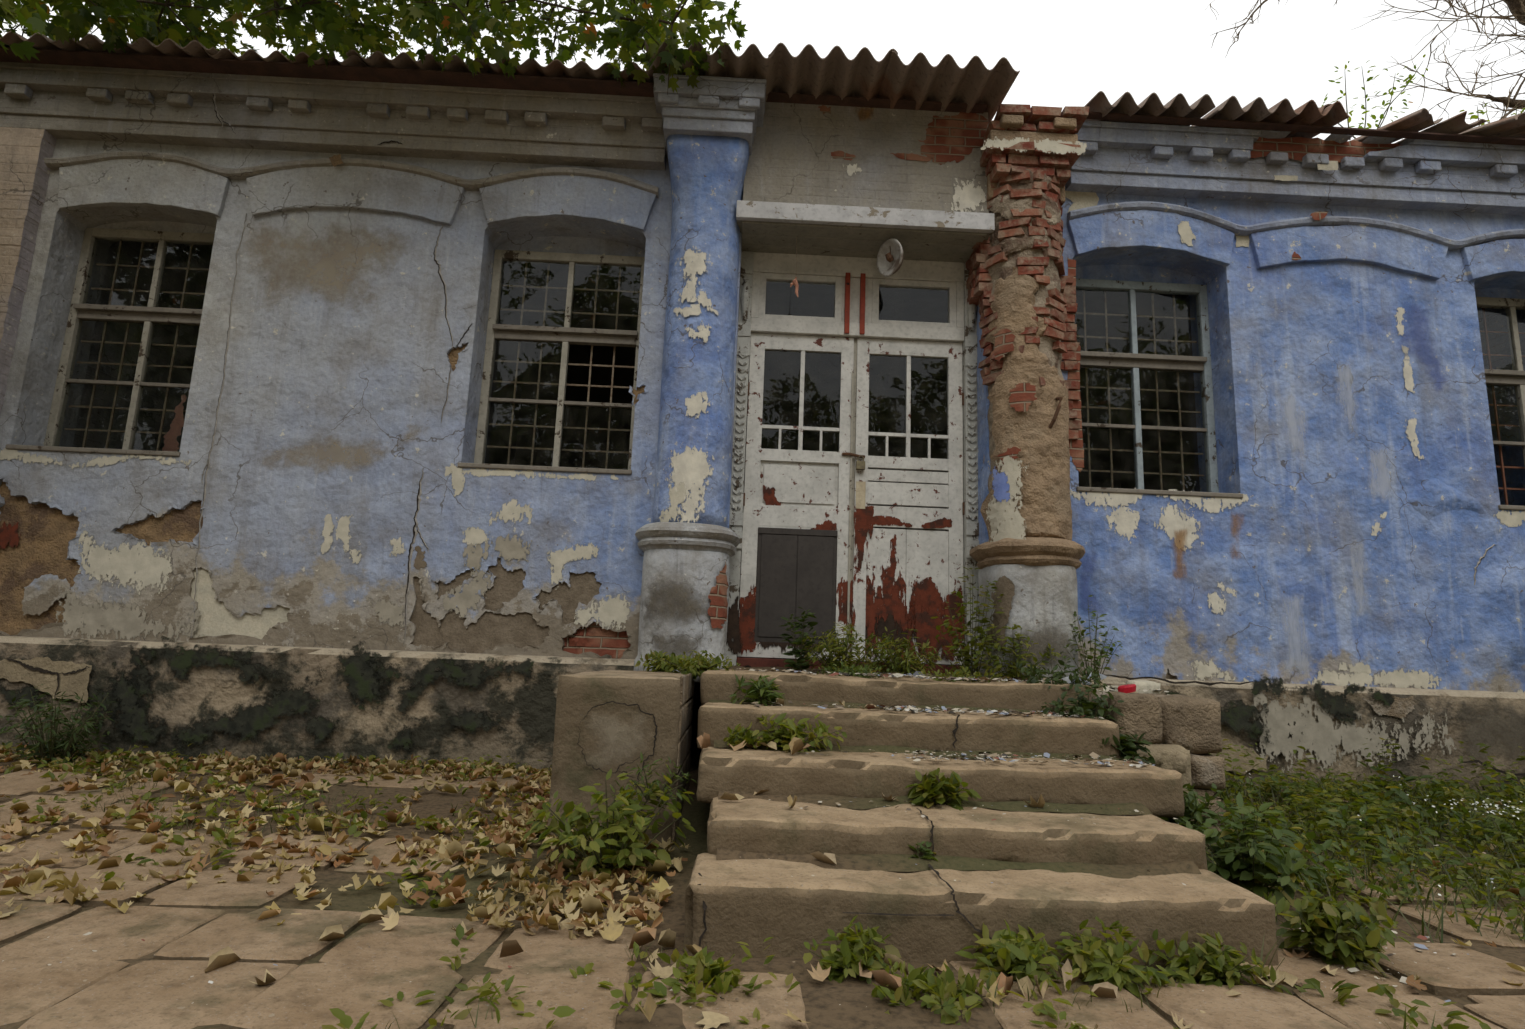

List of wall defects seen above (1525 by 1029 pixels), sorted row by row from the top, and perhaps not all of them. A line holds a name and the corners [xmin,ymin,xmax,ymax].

peeling [890,112,989,212]
peeling [1065,191,1099,212]
crack [433,225,472,423]
peeling [673,246,719,342]
peeling [1064,258,1084,472]
peeling [445,463,618,496]
peeling [0,448,294,643]
peeling [366,499,633,659]
peeling [1207,582,1236,615]
leakage [0,684,46,710]
leakage [81,636,534,751]
crack [843,808,992,940]